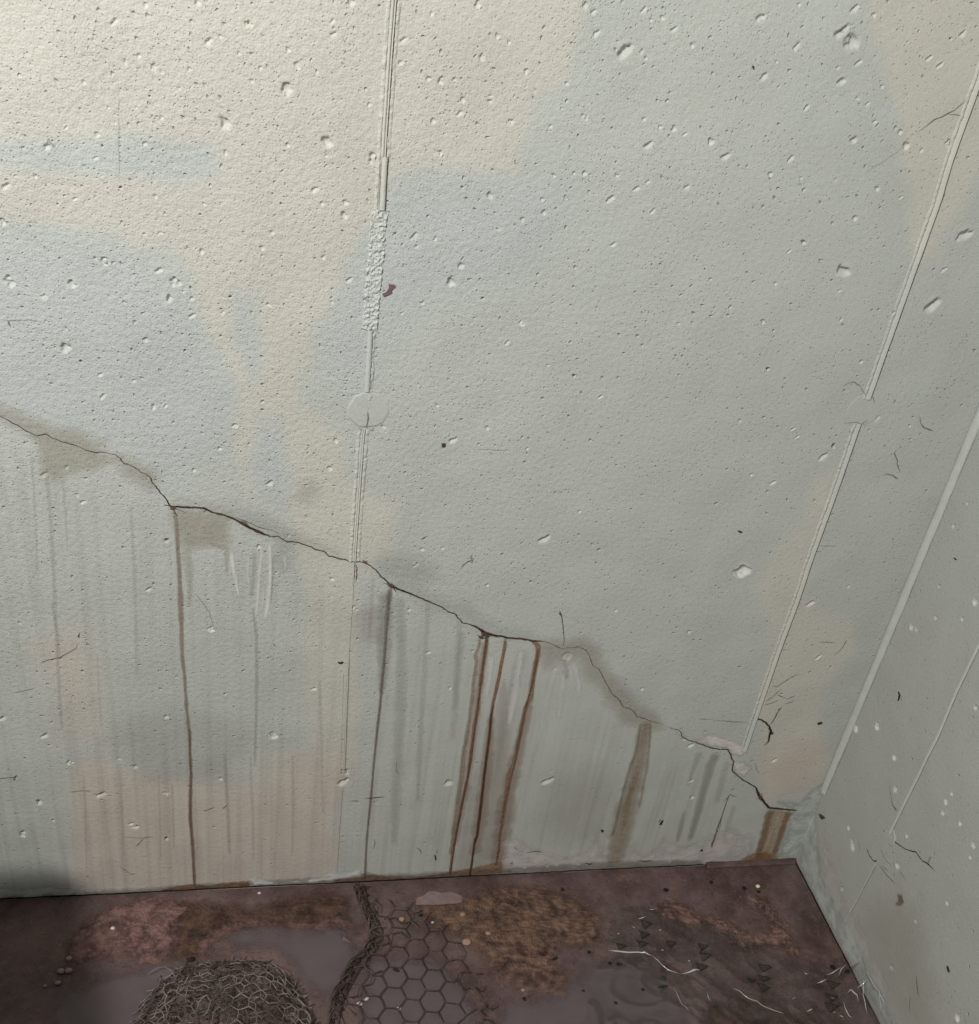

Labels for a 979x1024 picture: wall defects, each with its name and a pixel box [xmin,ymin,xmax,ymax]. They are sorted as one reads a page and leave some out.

rust [163,517,249,891]
damp [230,544,272,619]
damp [251,871,359,886]
crack [0,416,797,846]
rust [335,593,540,882]
rust [742,812,790,861]